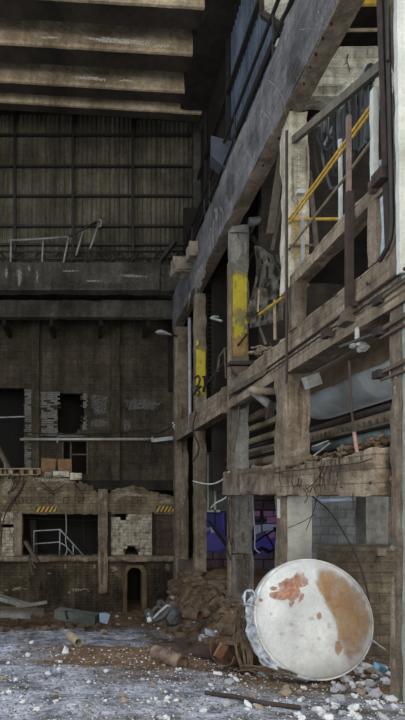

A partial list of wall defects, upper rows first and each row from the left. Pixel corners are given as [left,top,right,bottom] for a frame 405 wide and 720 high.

spalling [24,389,107,468]